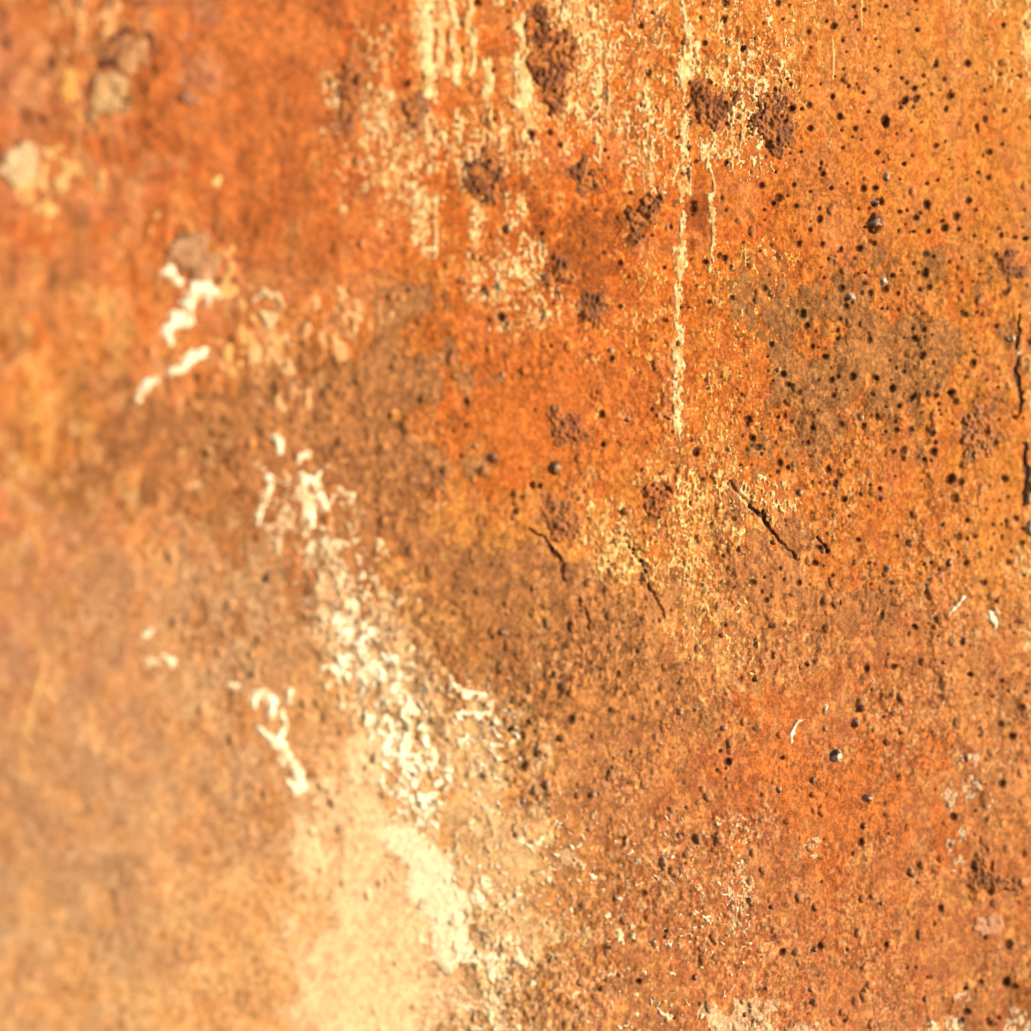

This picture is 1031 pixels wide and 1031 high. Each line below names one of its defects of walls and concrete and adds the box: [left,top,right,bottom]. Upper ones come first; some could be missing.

peeling [59,0,151,126]
corrosion [523,2,585,121]
corrosion [684,76,799,160]
efflorescence [134,347,210,404]
efflorescence [160,265,221,347]
corrosion [423,145,709,543]
leakage [271,433,284,454]
corrosion [952,405,1006,466]
crack [528,527,582,603]
crack [625,541,665,618]
leakage [242,450,821,1031]
corrosion [683,666,1026,913]